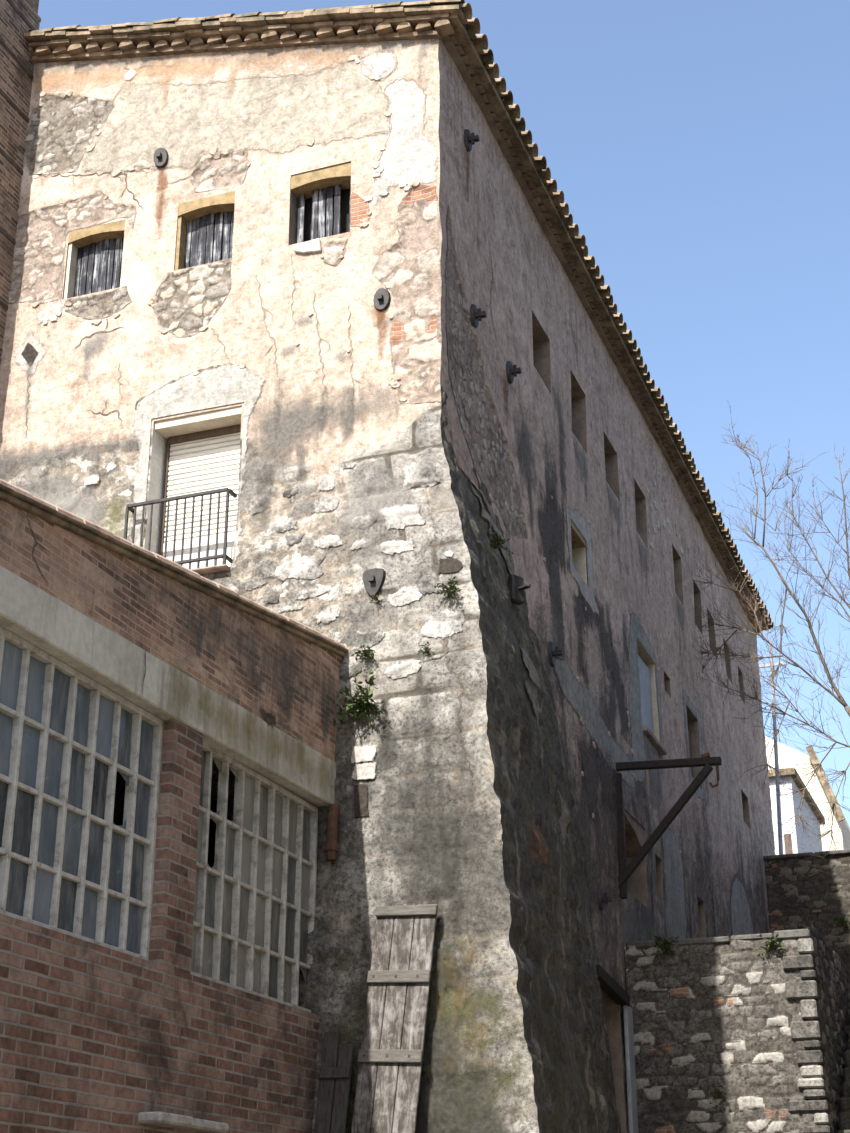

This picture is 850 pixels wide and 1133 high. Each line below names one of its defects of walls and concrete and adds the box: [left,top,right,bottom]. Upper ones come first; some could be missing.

peeling [8,50,570,575]
damp [518,421,534,536]
damp [555,398,588,505]
crack [25,515,49,583]
spalling [245,460,441,647]
spalling [384,659,421,679]
spalling [387,550,463,606]
spalling [420,608,466,640]
peeling [519,642,542,717]
peeling [574,590,634,755]